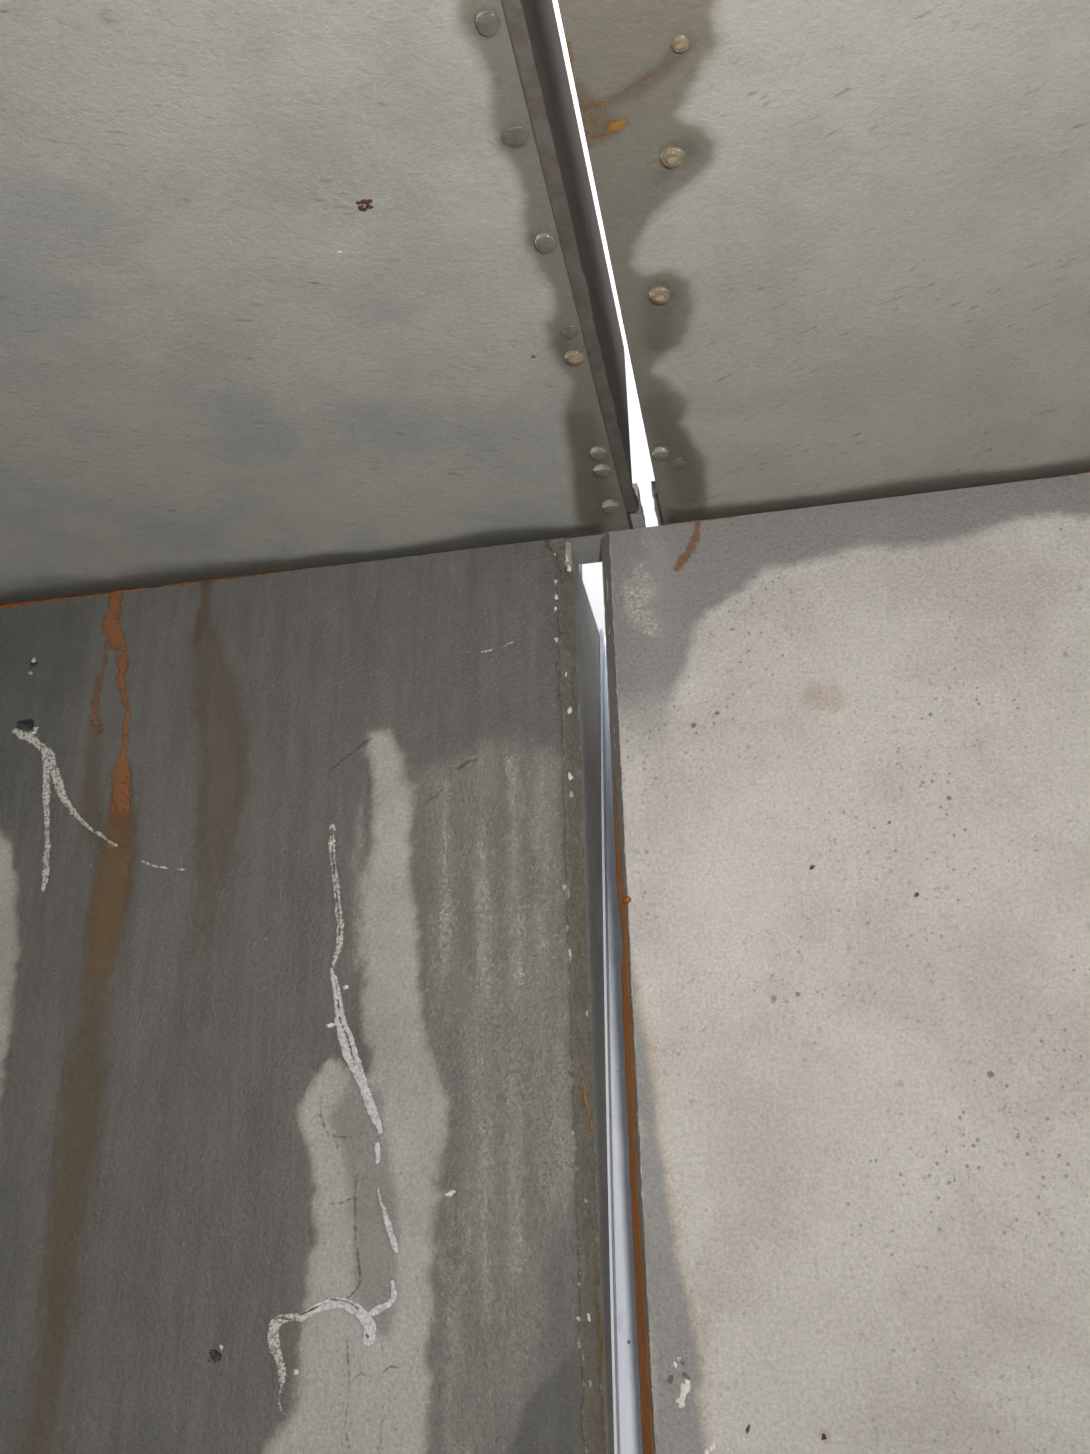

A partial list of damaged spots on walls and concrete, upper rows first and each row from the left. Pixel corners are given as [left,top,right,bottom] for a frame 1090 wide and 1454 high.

rust [567,42,647,137]
crack [13,728,185,891]
rust [0,566,327,978]
leakage [0,527,600,1454]
crack [267,824,398,1414]
rust [601,532,656,1454]
rust [672,511,775,571]
leakage [438,0,1090,779]